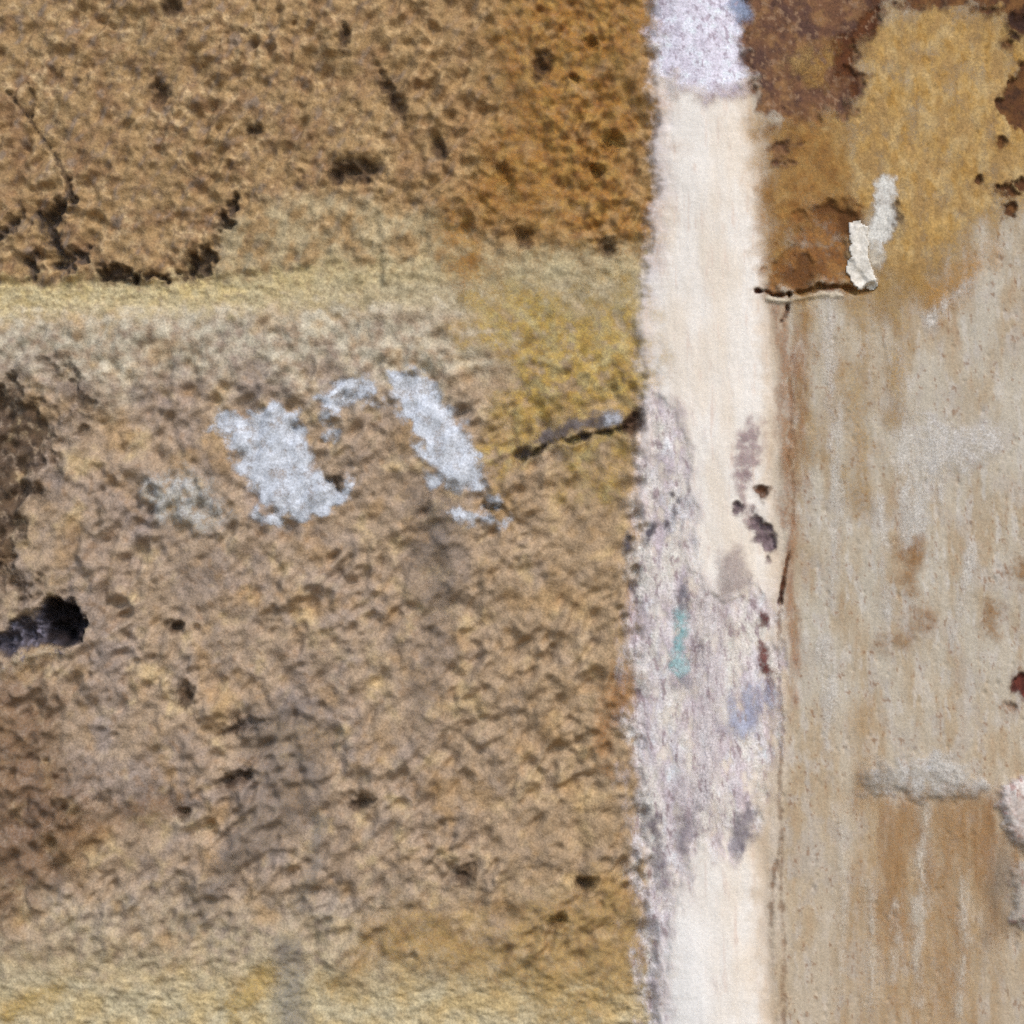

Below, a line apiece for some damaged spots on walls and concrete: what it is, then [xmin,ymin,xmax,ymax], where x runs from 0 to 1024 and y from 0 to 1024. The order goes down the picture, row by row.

spalling [647,0,1024,300]
damp [763,0,1024,326]
crack [754,283,874,310]
crack [518,411,644,462]
peeling [426,474,442,489]
peeling [488,496,501,511]